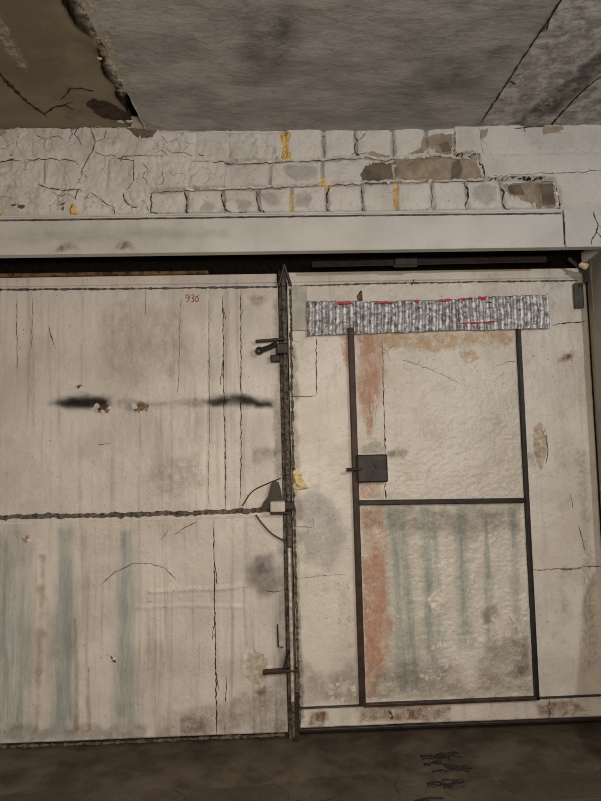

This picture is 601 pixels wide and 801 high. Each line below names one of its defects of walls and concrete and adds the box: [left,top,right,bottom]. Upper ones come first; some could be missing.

crack [0,0,601,245]
flaking render [360,132,484,185]
flaking render [503,181,560,209]
crack [161,522,227,733]